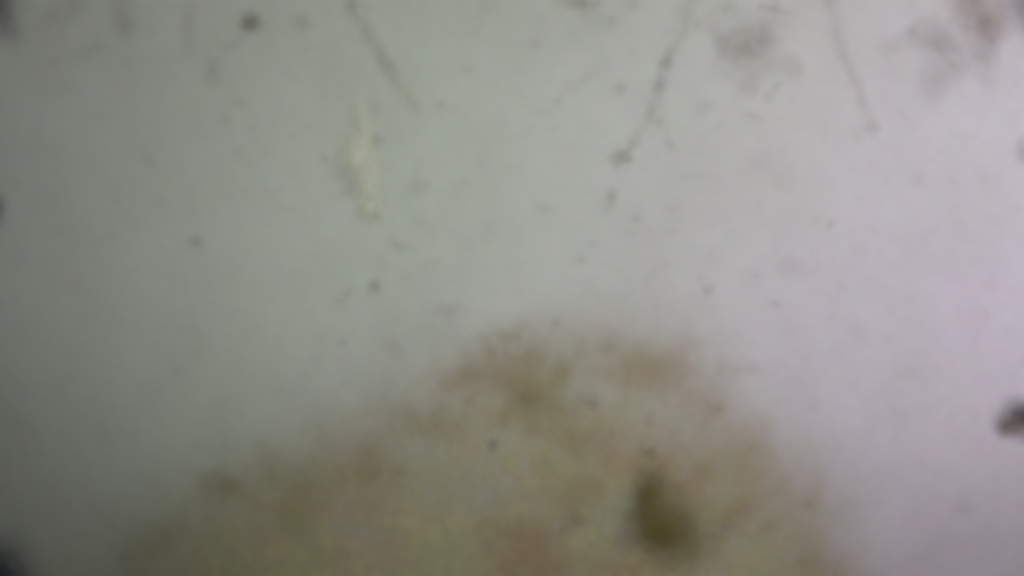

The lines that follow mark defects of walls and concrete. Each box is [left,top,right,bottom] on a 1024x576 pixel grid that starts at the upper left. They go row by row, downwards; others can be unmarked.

water stain [180,401,813,576]